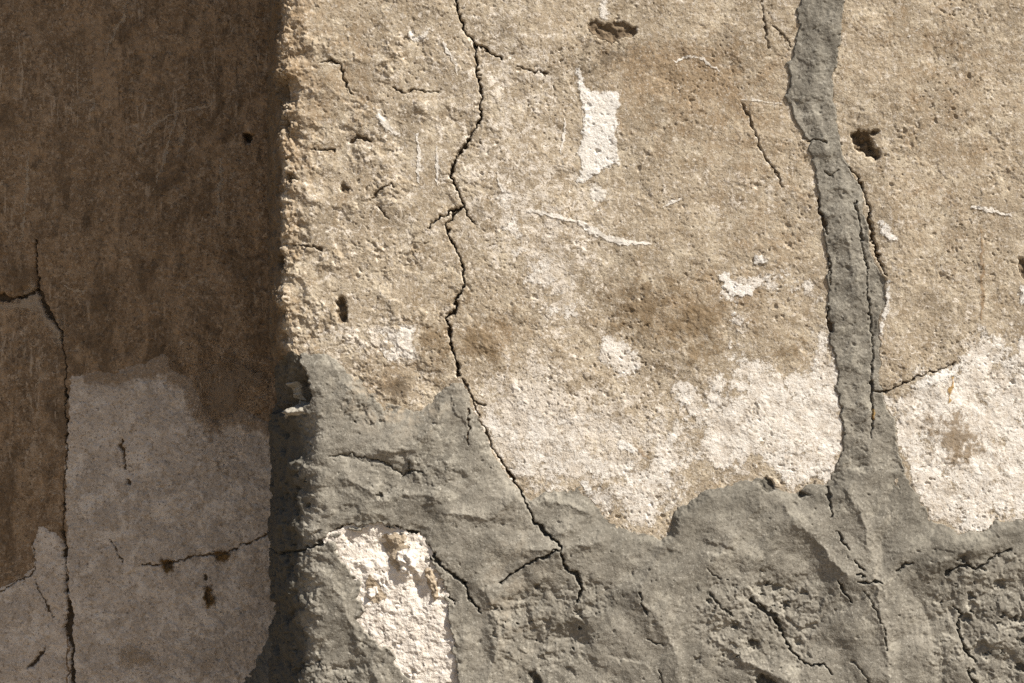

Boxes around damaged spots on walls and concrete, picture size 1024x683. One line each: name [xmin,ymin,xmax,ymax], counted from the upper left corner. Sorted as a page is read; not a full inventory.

spalling [588,20,637,44]
crack [743,105,783,187]
crack [429,0,547,452]
crack [817,172,832,281]
crack [825,307,833,332]
crack [854,202,954,436]
crack [0,240,76,683]
crack [110,523,481,613]
spalling [323,522,459,683]
crack [500,492,583,602]
crack [826,486,908,651]
crack [788,646,869,683]